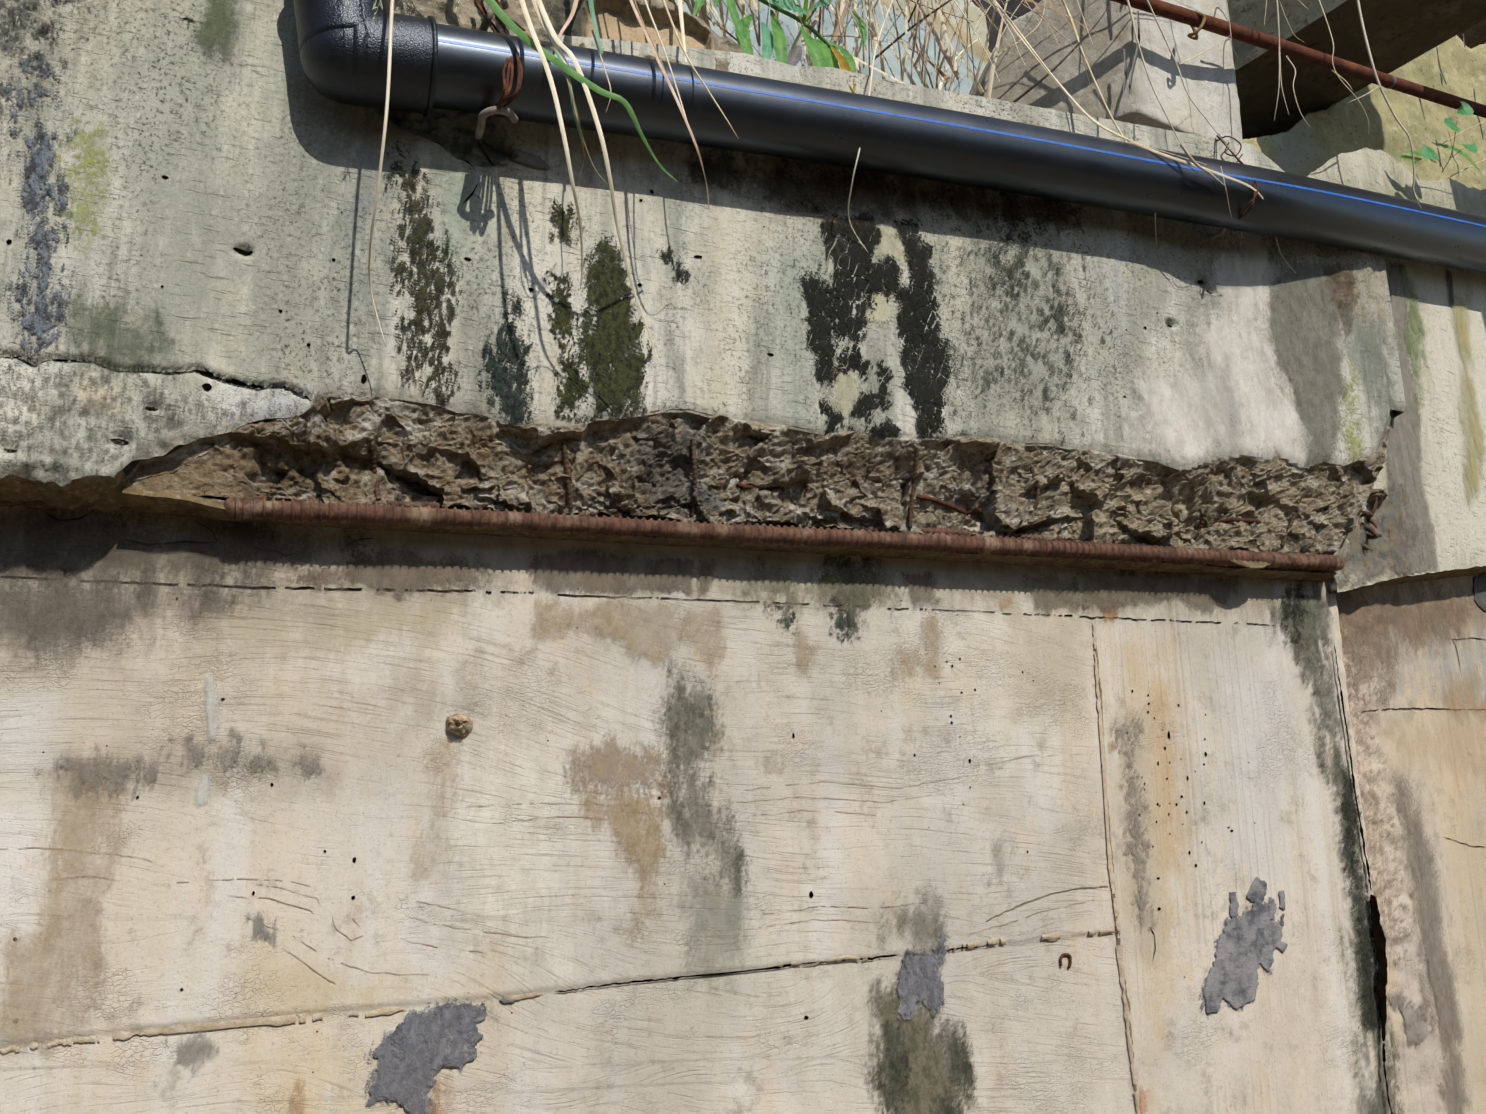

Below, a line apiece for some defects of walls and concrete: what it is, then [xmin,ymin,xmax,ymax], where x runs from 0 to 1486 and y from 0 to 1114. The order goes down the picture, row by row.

mould [0,27,80,381]
crack [6,356,312,401]
mould [383,140,653,427]
spalling [122,358,1391,569]
peeling [866,288,894,325]
peeling [872,217,908,266]
damp [796,188,1348,468]
damp [1280,585,1307,643]
peeling [1229,877,1288,953]
damp [1341,766,1381,1031]